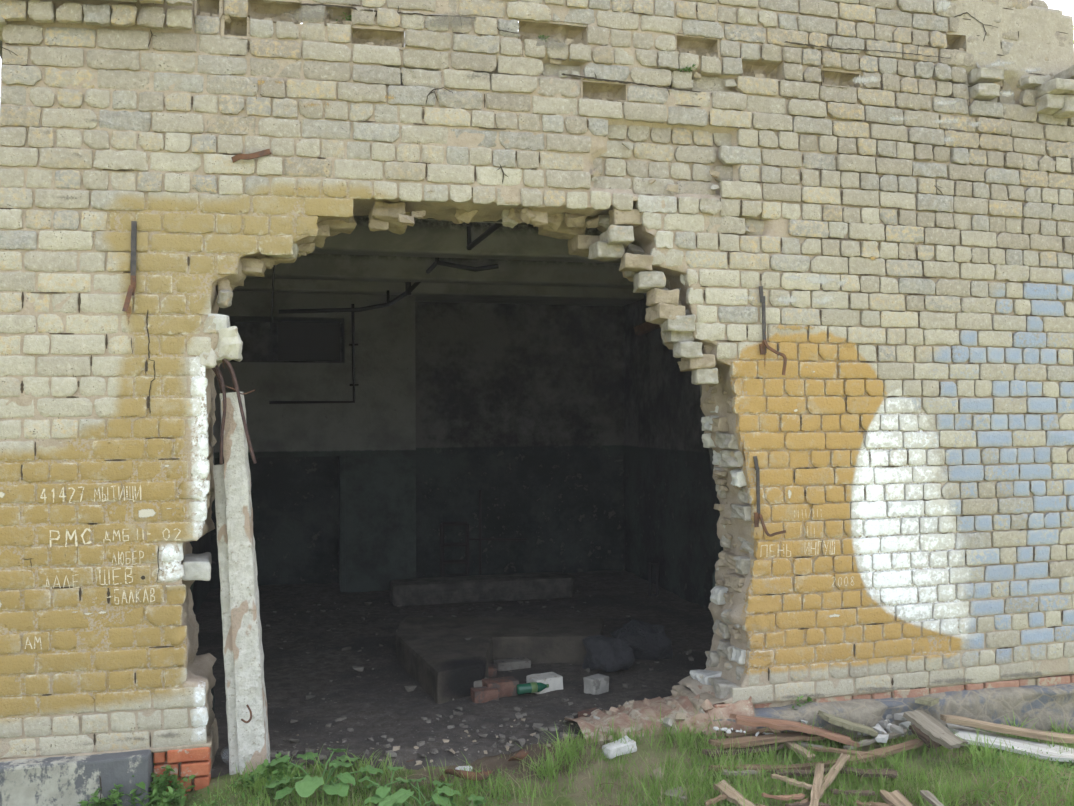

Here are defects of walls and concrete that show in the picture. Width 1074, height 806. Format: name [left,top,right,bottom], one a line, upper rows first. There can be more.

spalling [194,0,302,40]
spalling [324,2,405,50]
spalling [518,19,588,45]
spalling [675,33,721,59]
spalling [946,31,967,51]
spalling [542,58,628,104]
spalling [671,56,785,92]
spalling [821,65,865,89]
spalling [591,125,733,196]
spalling [241,201,426,277]
spalling [216,279,233,308]
spalling [501,207,754,699]